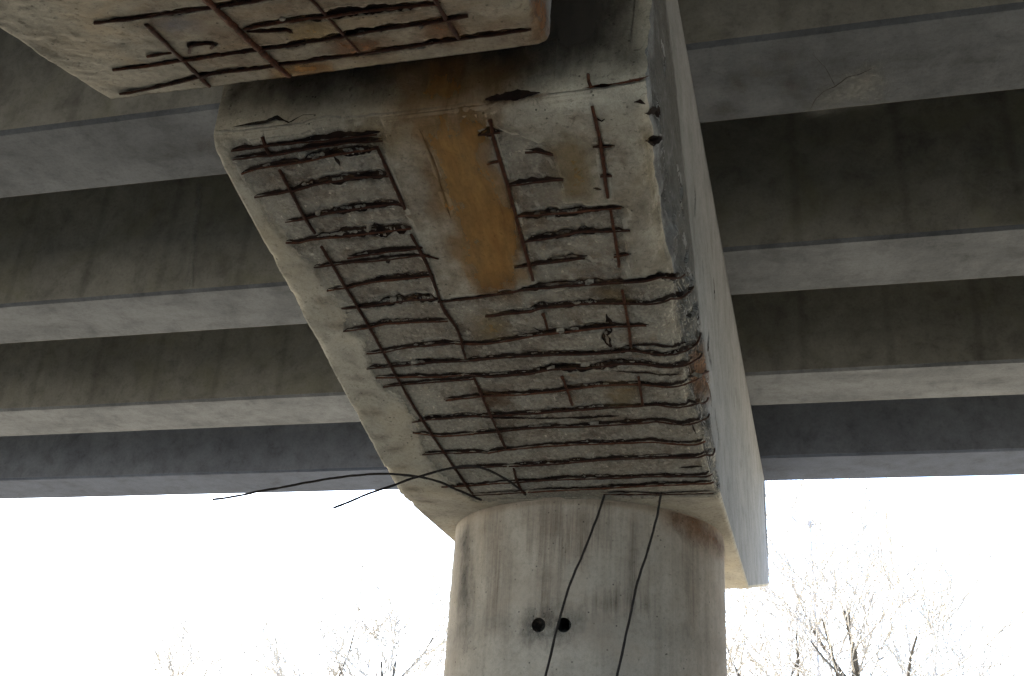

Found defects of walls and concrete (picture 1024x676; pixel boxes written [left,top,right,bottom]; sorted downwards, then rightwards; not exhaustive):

spalling [93,0,532,95]
corrosion [421,106,524,293]
spalling [212,0,720,676]